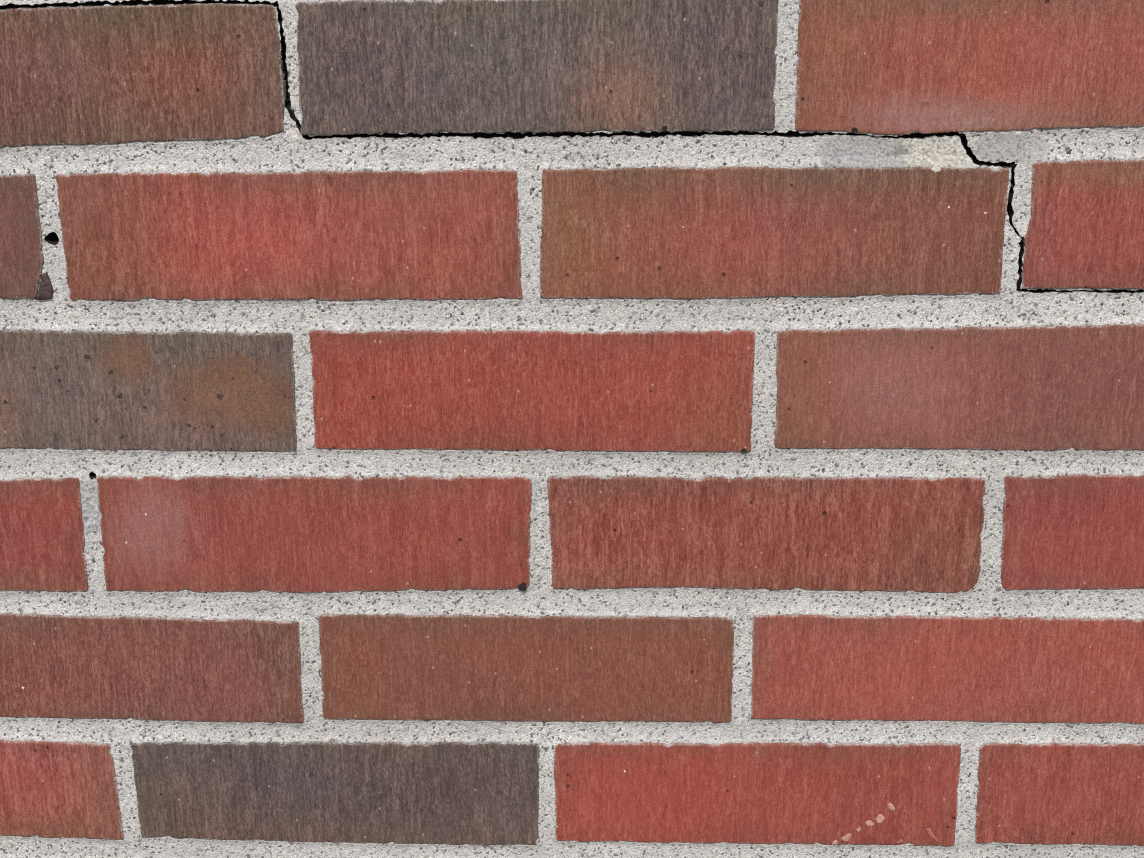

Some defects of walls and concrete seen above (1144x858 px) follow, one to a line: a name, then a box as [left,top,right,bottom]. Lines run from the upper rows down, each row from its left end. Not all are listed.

crack [0,0,1144,293]